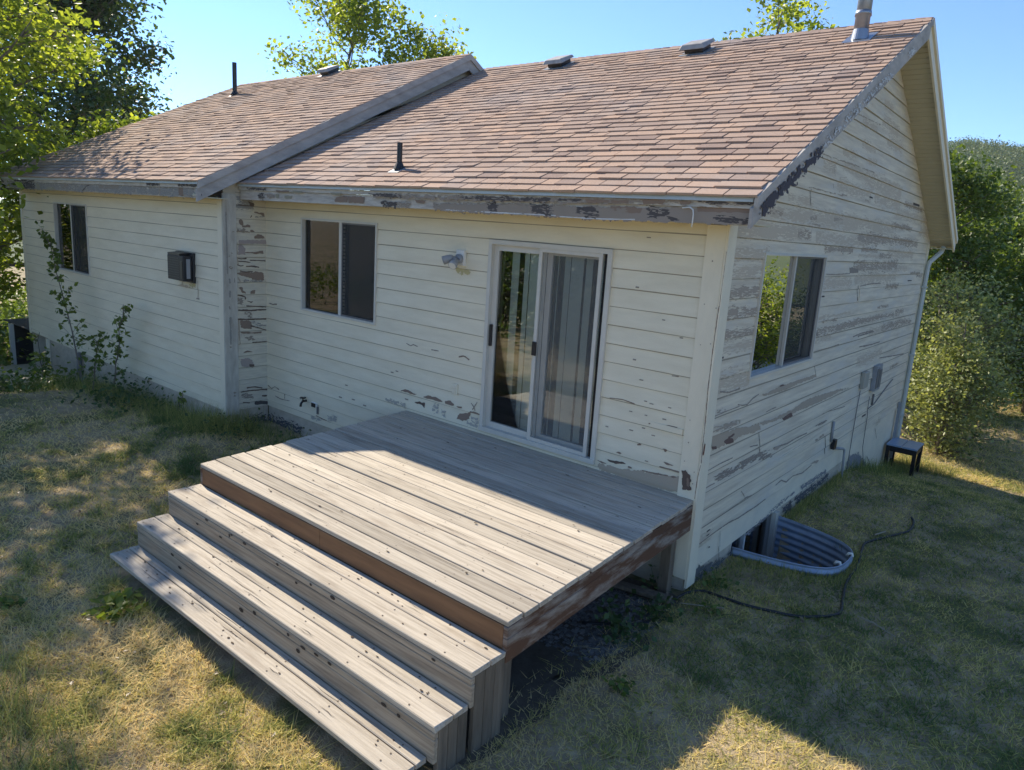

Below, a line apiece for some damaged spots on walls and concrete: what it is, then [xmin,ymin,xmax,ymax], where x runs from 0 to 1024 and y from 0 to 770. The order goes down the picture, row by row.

peeling [331,192,754,225]
peeling [225,196,266,345]
peeling [385,389,479,428]
peeling [711,388,848,451]
peeling [598,449,689,492]